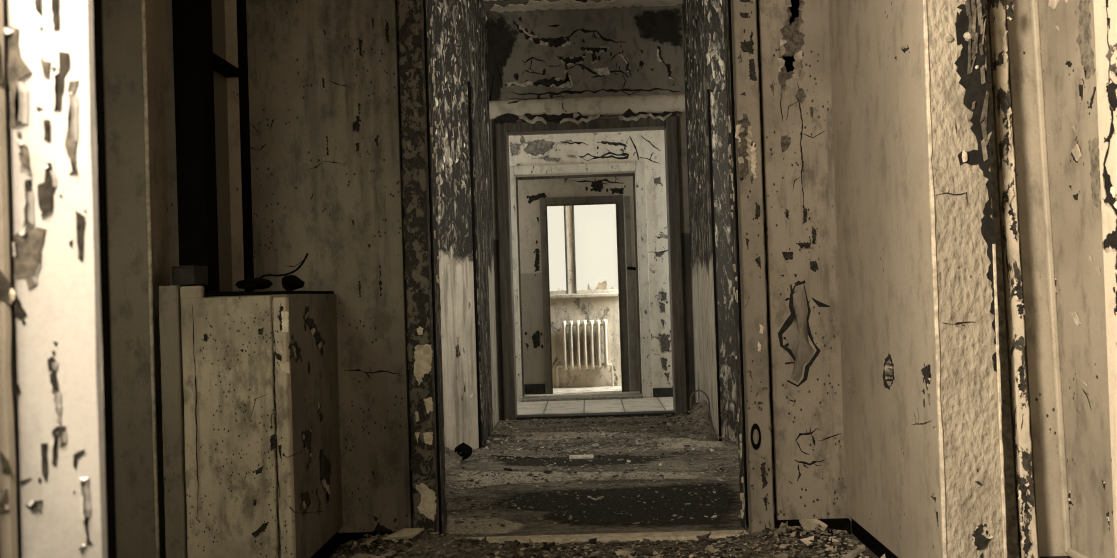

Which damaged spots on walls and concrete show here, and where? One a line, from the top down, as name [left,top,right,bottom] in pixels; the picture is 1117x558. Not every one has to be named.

peeling [35,0,60,31]
peeling [432,0,725,195]
peeling [739,0,757,96]
peeling [770,0,814,118]
peeling [0,26,79,325]
peeling [69,210,86,261]
peeling [945,0,1001,372]
peeling [1008,208,1019,241]
peeling [1048,0,1117,315]
peeling [1014,281,1025,319]
peeling [1016,365,1027,398]
peeling [1018,482,1033,557]